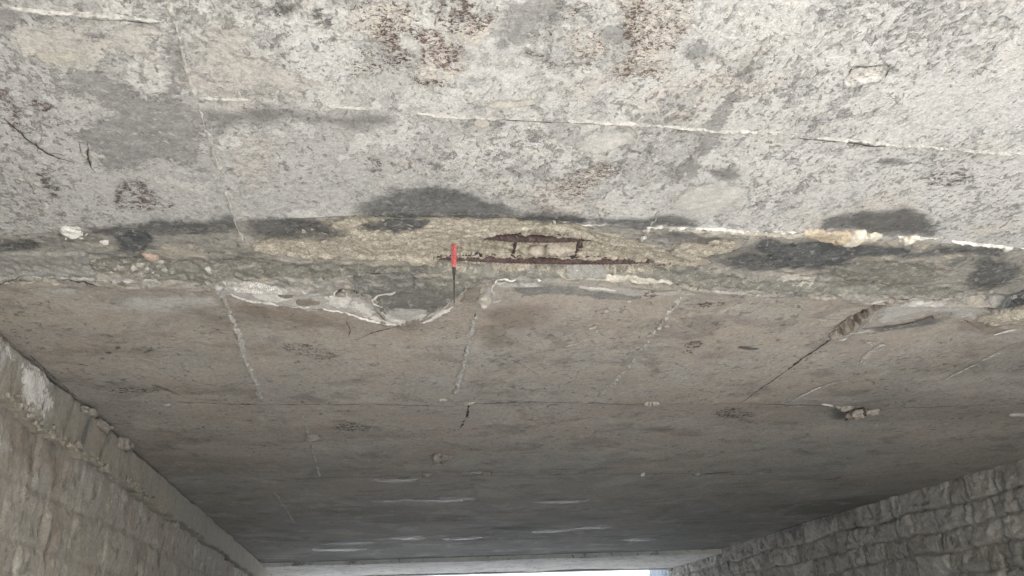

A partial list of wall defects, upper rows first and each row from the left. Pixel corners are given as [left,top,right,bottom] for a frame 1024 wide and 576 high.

crack [4,119,96,173]
crack [795,137,885,147]
spalling [251,214,737,340]
water stain [360,188,1024,291]
peeling [738,290,1024,404]